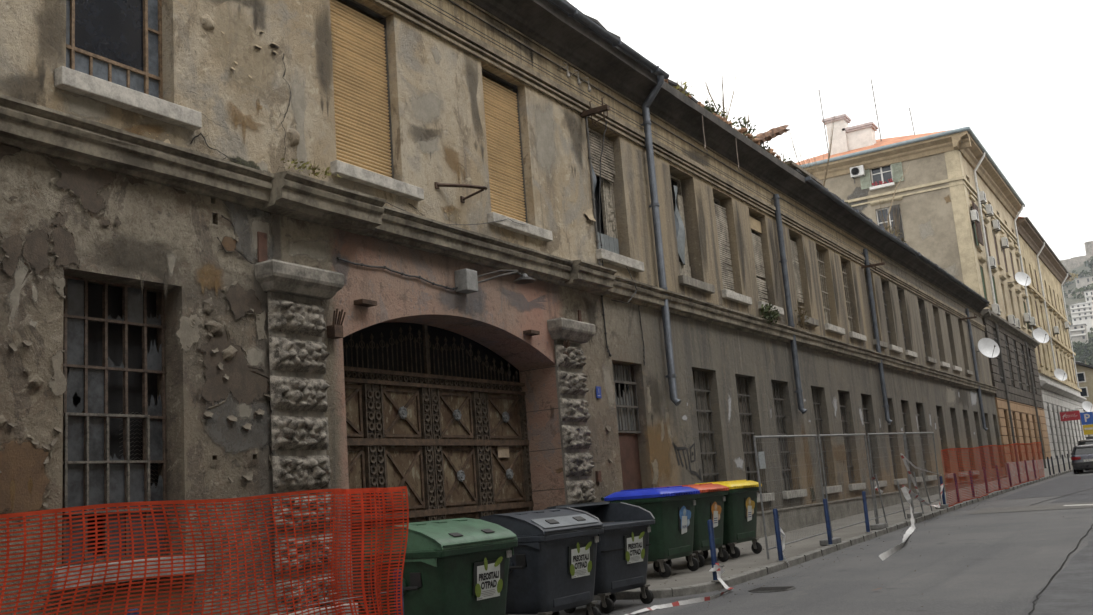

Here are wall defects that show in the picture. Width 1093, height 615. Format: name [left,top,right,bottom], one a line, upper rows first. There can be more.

water stain [238,0,264,30]
crack [186,82,245,166]
crack [276,53,291,173]
flaking render [48,350,67,395]
flaking render [176,311,270,431]